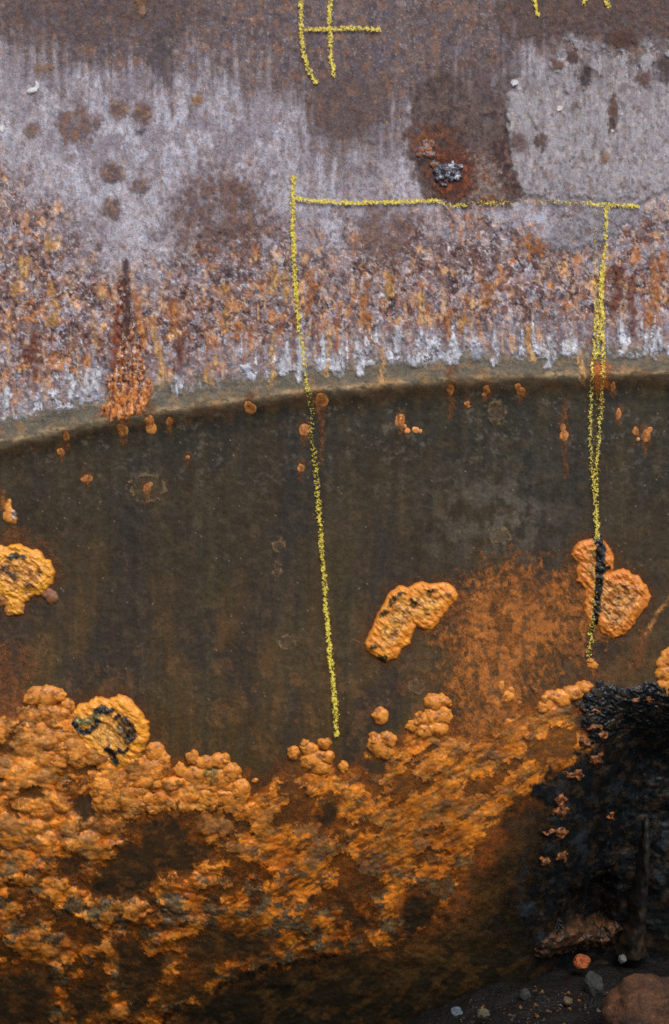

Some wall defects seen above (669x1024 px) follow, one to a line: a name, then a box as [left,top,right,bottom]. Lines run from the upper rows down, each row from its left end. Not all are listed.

corrosion [104,198,120,220]
corrosion [165,163,262,253]
corrosion [355,192,422,297]
corrosion [416,139,479,202]
leakage [1,358,105,422]
corrosion [101,258,190,422]
leakage [235,325,499,417]
corrosion [360,283,386,385]
leakage [512,315,585,368]
leakage [607,315,669,358]
corrosion [611,249,668,336]
corrosion [0,556,608,1024]